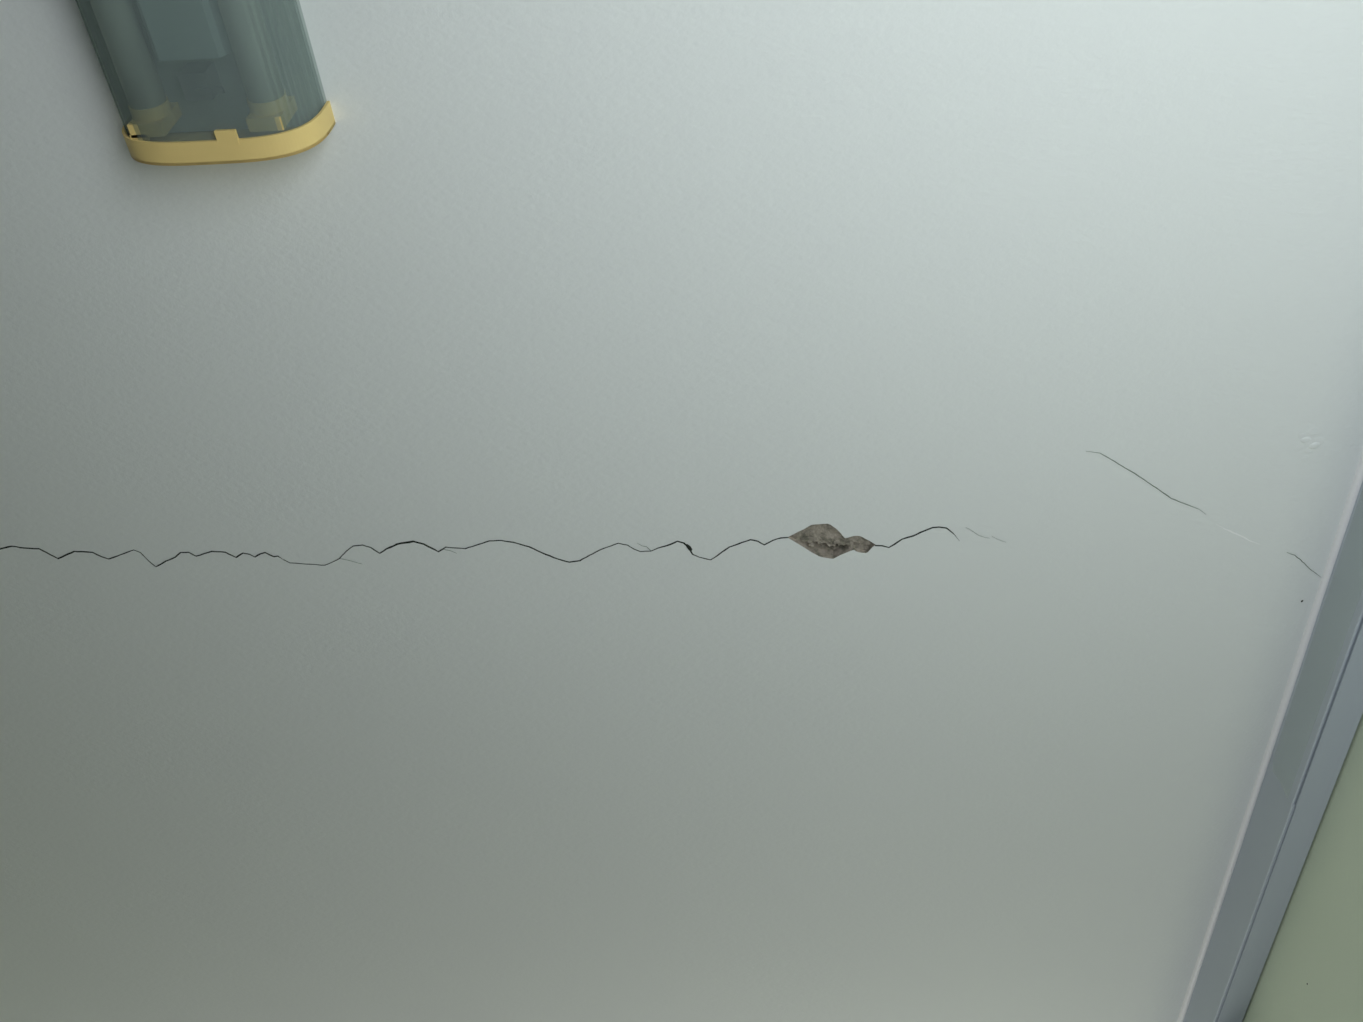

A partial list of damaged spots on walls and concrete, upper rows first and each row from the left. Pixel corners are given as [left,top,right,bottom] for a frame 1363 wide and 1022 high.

crack [0,537,788,567]
flaking render [788,524,875,559]
crack [875,526,1004,548]